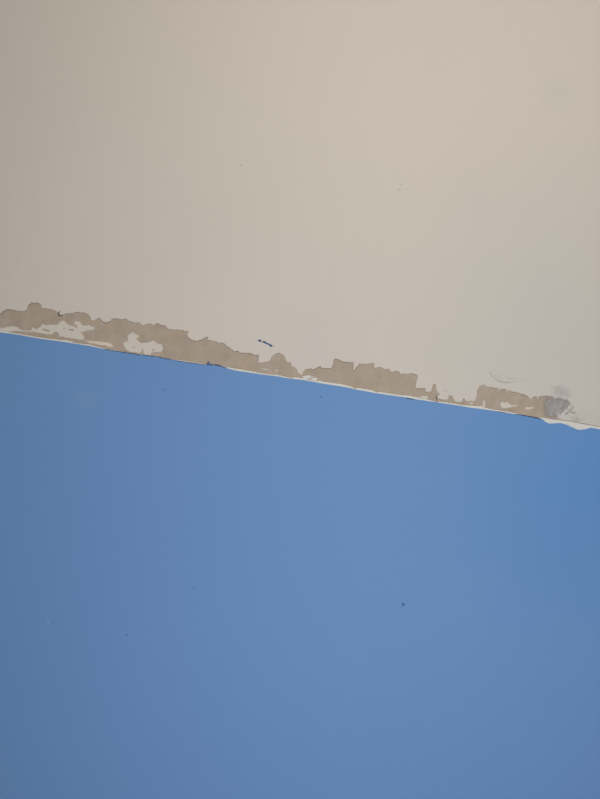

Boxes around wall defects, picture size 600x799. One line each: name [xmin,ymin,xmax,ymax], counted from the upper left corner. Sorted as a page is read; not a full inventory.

peeling [0,302,600,430]